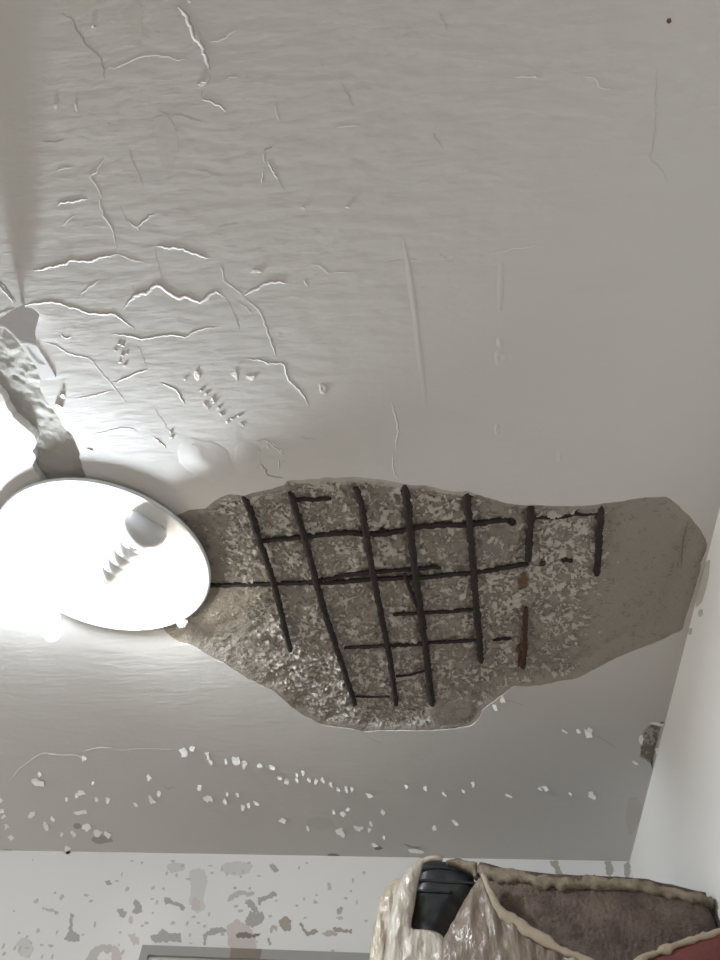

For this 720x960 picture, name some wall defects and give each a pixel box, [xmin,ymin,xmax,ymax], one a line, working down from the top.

crack [62,0,237,121]
crack [261,146,285,190]
crack [0,157,349,448]
corrosion [518,572,529,590]
spalling [163,477,707,732]
spalling [632,722,665,765]
peeling [179,746,354,793]
peeling [197,785,259,811]
peeling [60,810,113,854]
peeling [332,807,385,850]
peeling [227,919,256,949]
peeling [270,916,352,936]